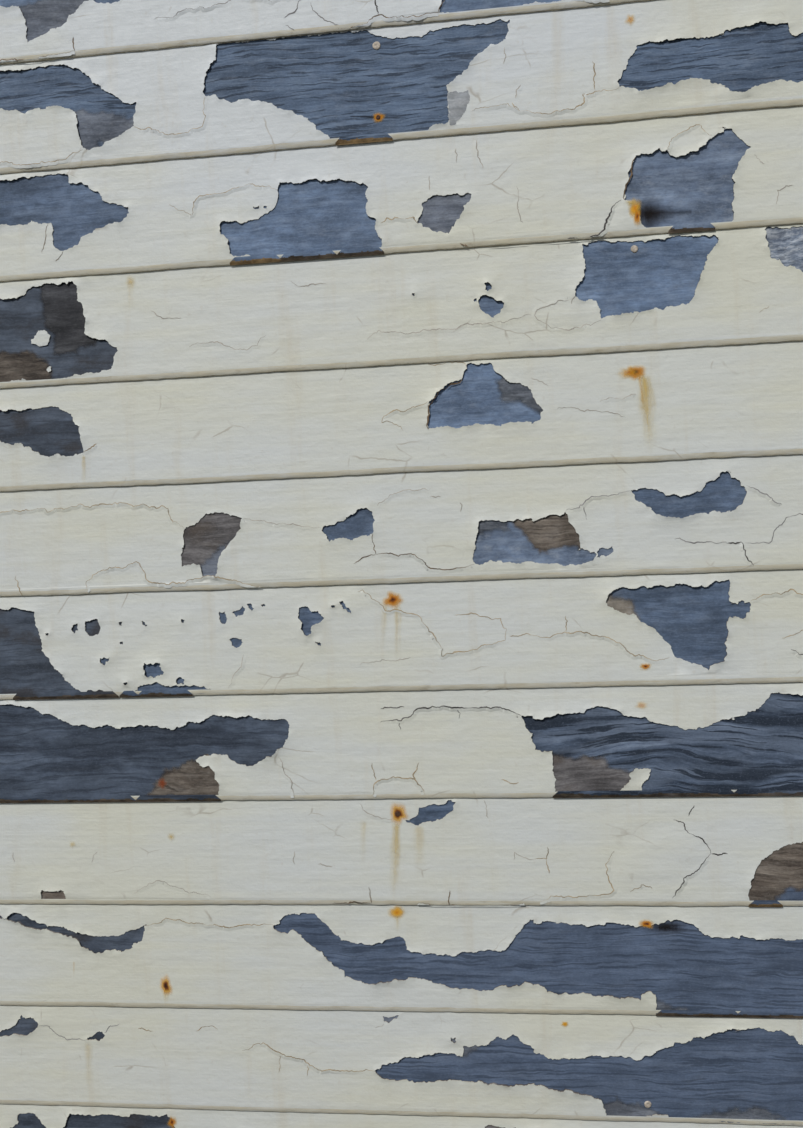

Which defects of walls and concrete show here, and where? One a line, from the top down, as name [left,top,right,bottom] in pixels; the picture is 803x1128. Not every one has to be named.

peeling [0,65,136,150]
crack [154,0,438,30]
peeling [203,0,561,145]
peeling [618,22,803,92]
peeling [575,127,750,318]
peeling [0,281,118,382]
corrosion [628,367,648,415]
peeling [0,607,289,803]
peeling [521,692,803,798]
corrosion [393,806,405,841]
crack [485,807,727,906]
peeling [274,913,803,1124]